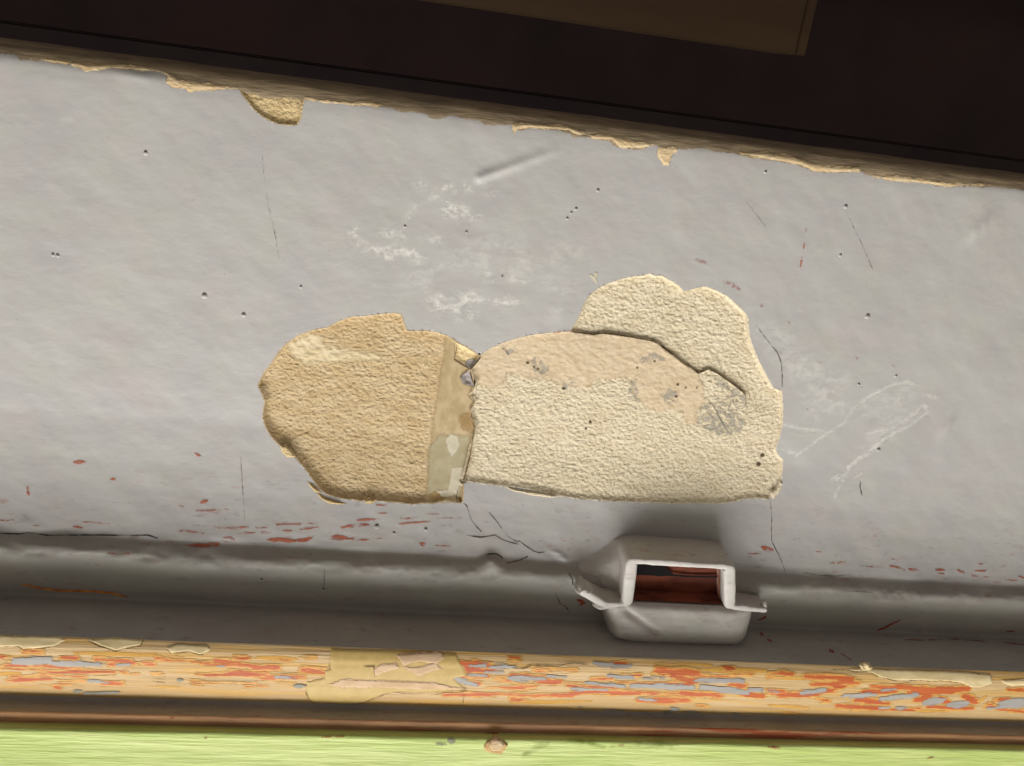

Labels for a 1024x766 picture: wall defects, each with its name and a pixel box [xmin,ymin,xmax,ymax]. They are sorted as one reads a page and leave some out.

peeling [0,37,1024,191]
peeling [257,272,784,505]
crack [465,504,544,563]
peeling [0,635,1024,715]